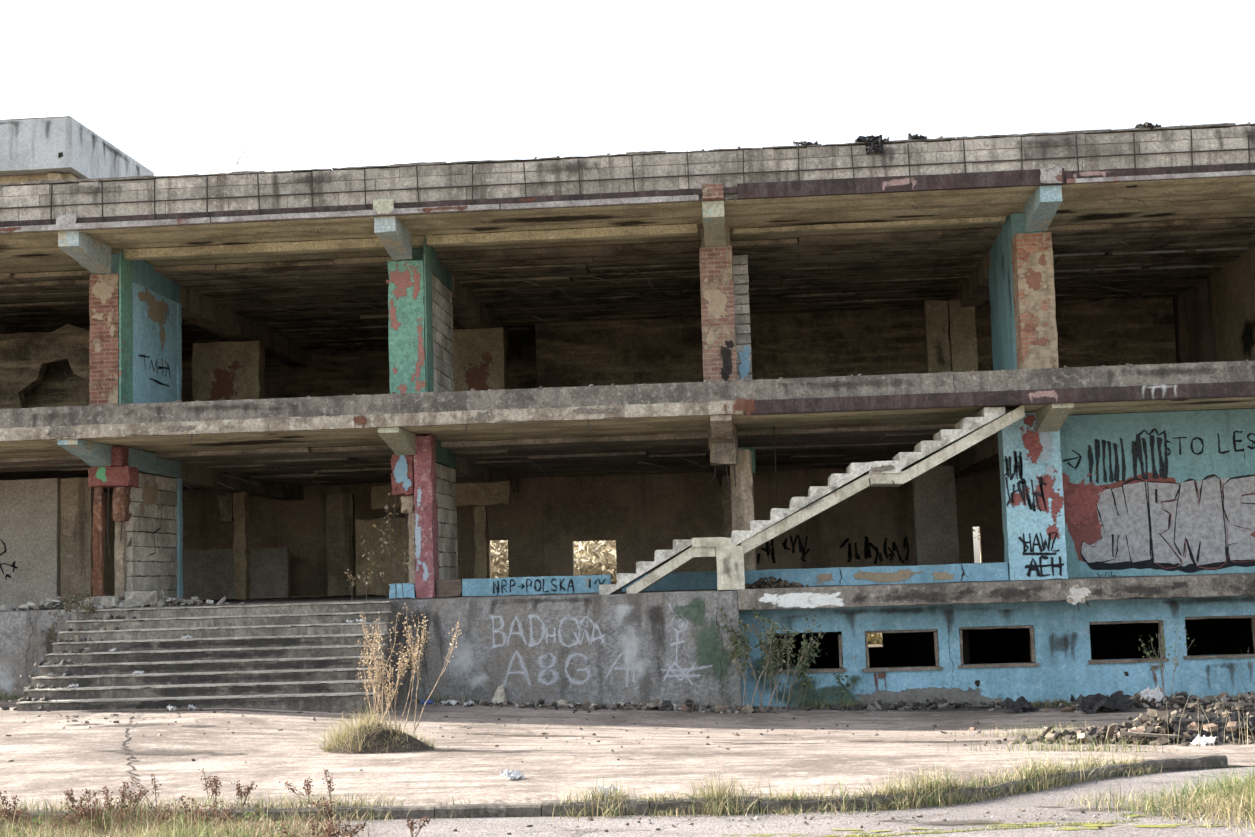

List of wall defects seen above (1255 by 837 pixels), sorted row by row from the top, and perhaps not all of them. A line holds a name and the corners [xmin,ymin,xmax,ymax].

flaking render [1022,250,1047,295]
flaking render [91,280,115,337]
peeling [138,288,169,351]
peeling [386,262,424,393]
flaking render [703,279,750,381]
peeling [1010,414,1107,540]
peeling [390,455,429,581]
peeling [758,574,844,608]
peeling [853,569,955,583]
water stain [880,590,953,628]